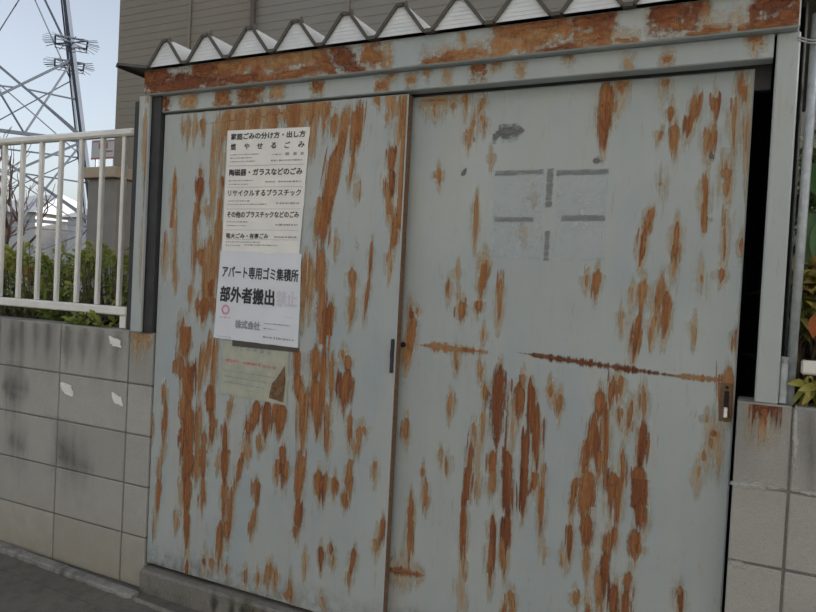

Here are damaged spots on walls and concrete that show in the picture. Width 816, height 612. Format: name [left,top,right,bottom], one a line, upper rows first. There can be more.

corrosion [142,0,800,591]
corrosion [243,559,294,606]
corrosion [672,585,685,612]